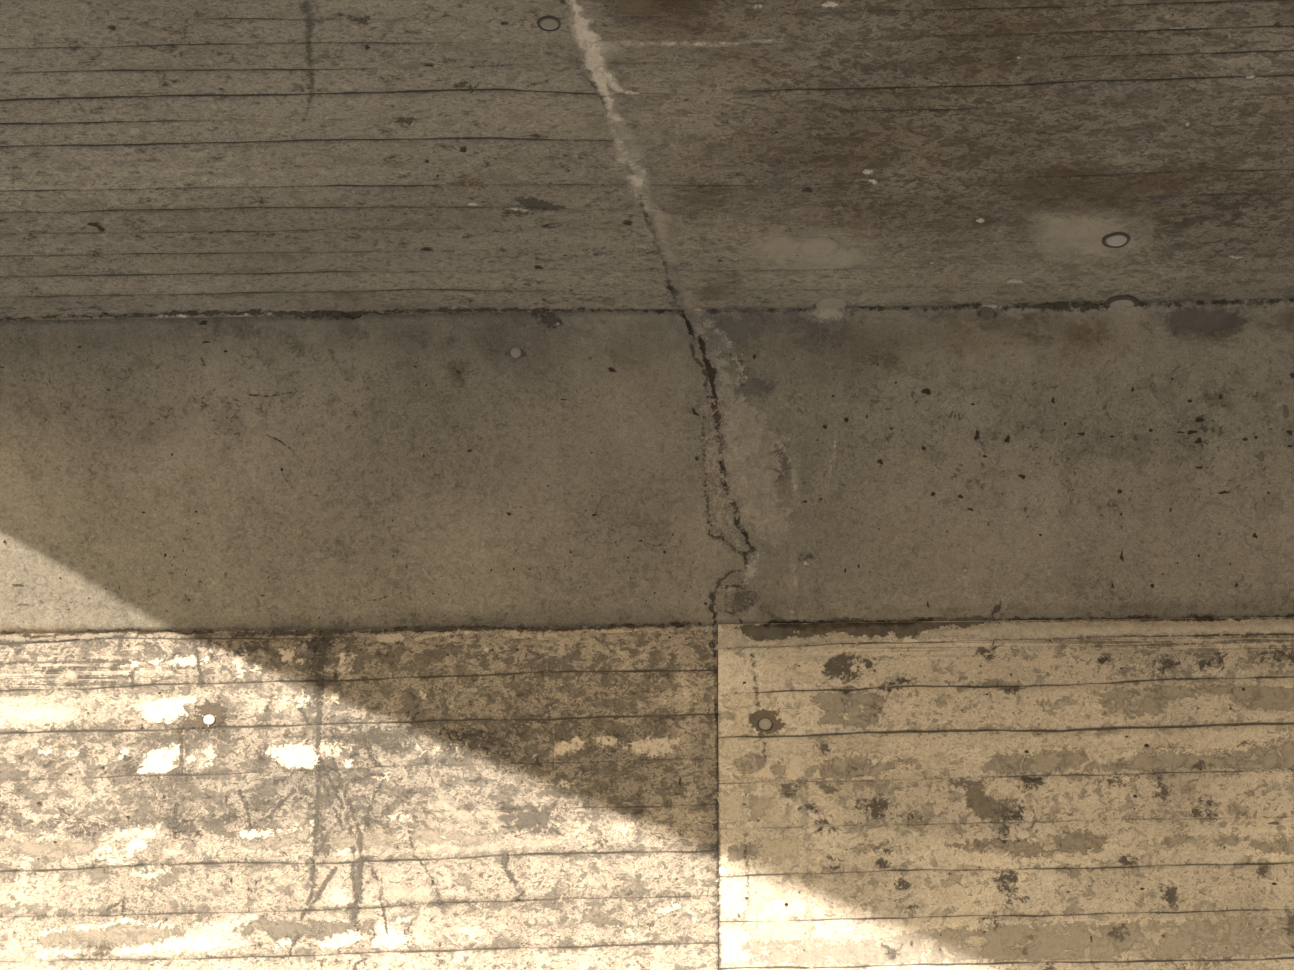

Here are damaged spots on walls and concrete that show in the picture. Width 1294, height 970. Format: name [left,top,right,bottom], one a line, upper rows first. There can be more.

leakage [568,0,740,270]
crack [589,79,756,969]
peeling [134,690,201,725]
peeling [117,743,219,779]
peeling [120,648,263,679]
peeling [265,738,354,773]
peeling [532,732,683,761]
crack [750,655,760,706]
spalling [714,574,1062,728]
peeling [0,800,637,883]
peeling [713,683,1294,970]
peeling [1,883,492,970]